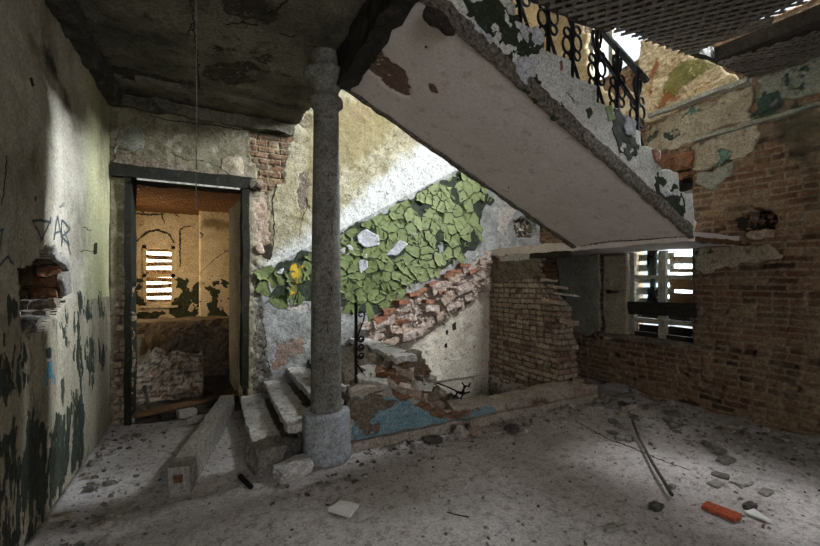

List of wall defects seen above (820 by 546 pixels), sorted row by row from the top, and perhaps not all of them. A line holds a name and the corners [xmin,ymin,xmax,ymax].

spalling [419,0,778,246]
spalling [0,245,229,546]
peeling [248,131,312,394]
peeling [340,171,544,440]